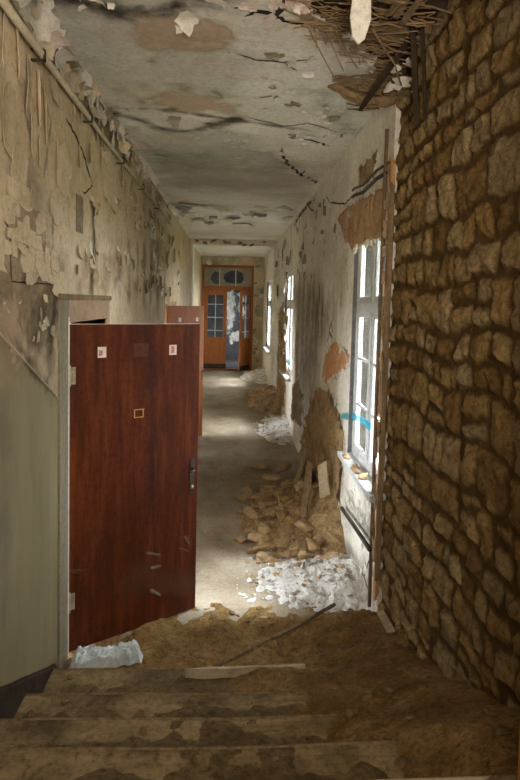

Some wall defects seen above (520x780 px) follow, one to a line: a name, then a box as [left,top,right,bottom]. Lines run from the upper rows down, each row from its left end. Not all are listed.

leakage [65,0,180,18]
peeling [0,0,388,580]